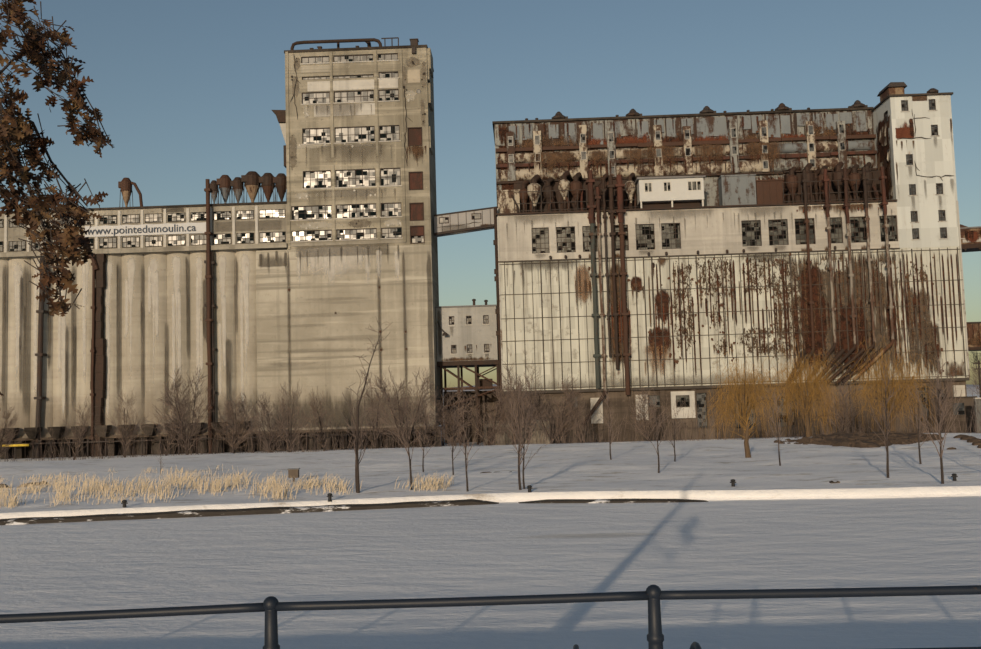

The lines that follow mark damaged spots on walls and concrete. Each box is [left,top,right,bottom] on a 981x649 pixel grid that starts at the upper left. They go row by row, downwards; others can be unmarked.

corrosion [497,112,914,210]
crack [897,113,953,181]
damp [2,262,89,418]
damp [105,256,206,413]
damp [218,245,399,415]
corrosion [575,255,596,303]
corrosion [609,246,981,386]